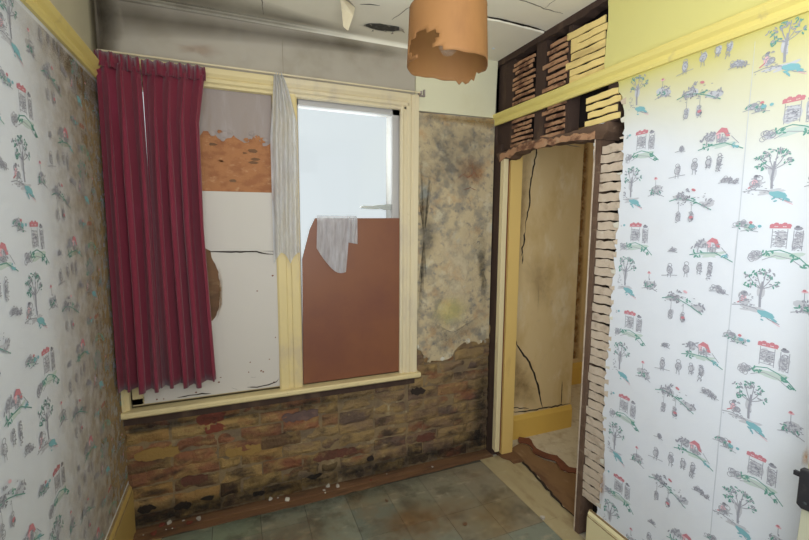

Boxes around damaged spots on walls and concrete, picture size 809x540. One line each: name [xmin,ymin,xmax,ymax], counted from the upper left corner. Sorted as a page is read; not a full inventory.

peeling [200,130,272,193]
crack [521,149,537,263]
crack [514,341,570,413]
spalling [313,447,357,462]
spalling [174,495,214,510]
leakage [135,462,388,525]